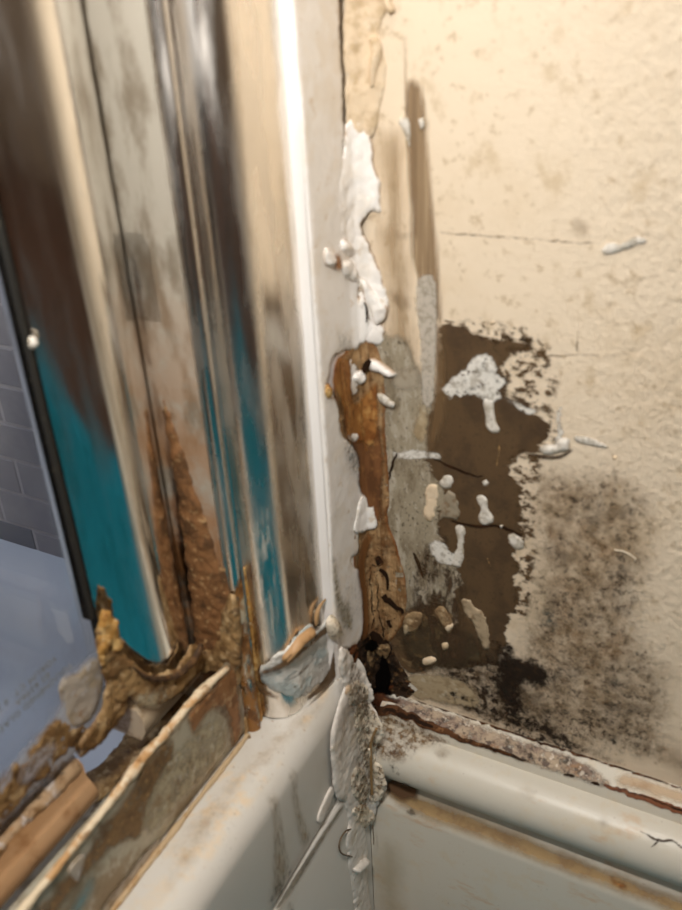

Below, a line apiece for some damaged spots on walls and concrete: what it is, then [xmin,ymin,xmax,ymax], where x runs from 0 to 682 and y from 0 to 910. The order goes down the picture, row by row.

peeling [290,0,557,674]
corrosion [40,742,174,910]
corrosion [160,399,263,745]
corrosion [371,693,400,706]
damp [351,482,654,808]
crack [375,701,682,815]
crack [648,834,682,848]